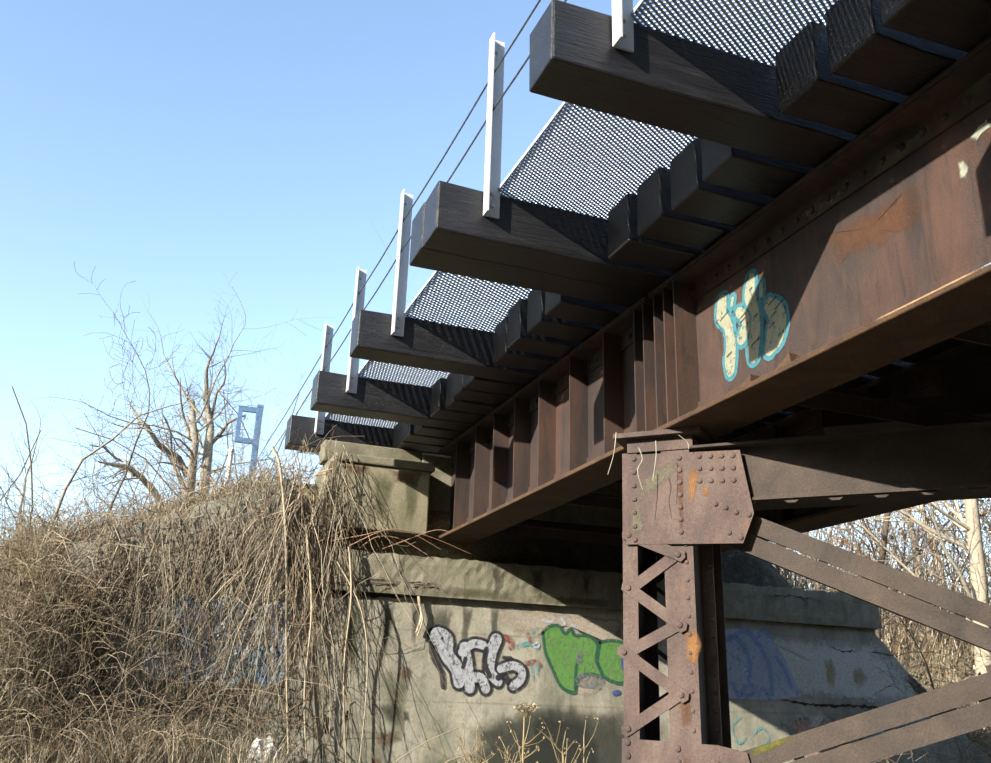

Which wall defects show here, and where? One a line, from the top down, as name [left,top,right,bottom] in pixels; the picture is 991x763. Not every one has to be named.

rust [687,635,699,662]